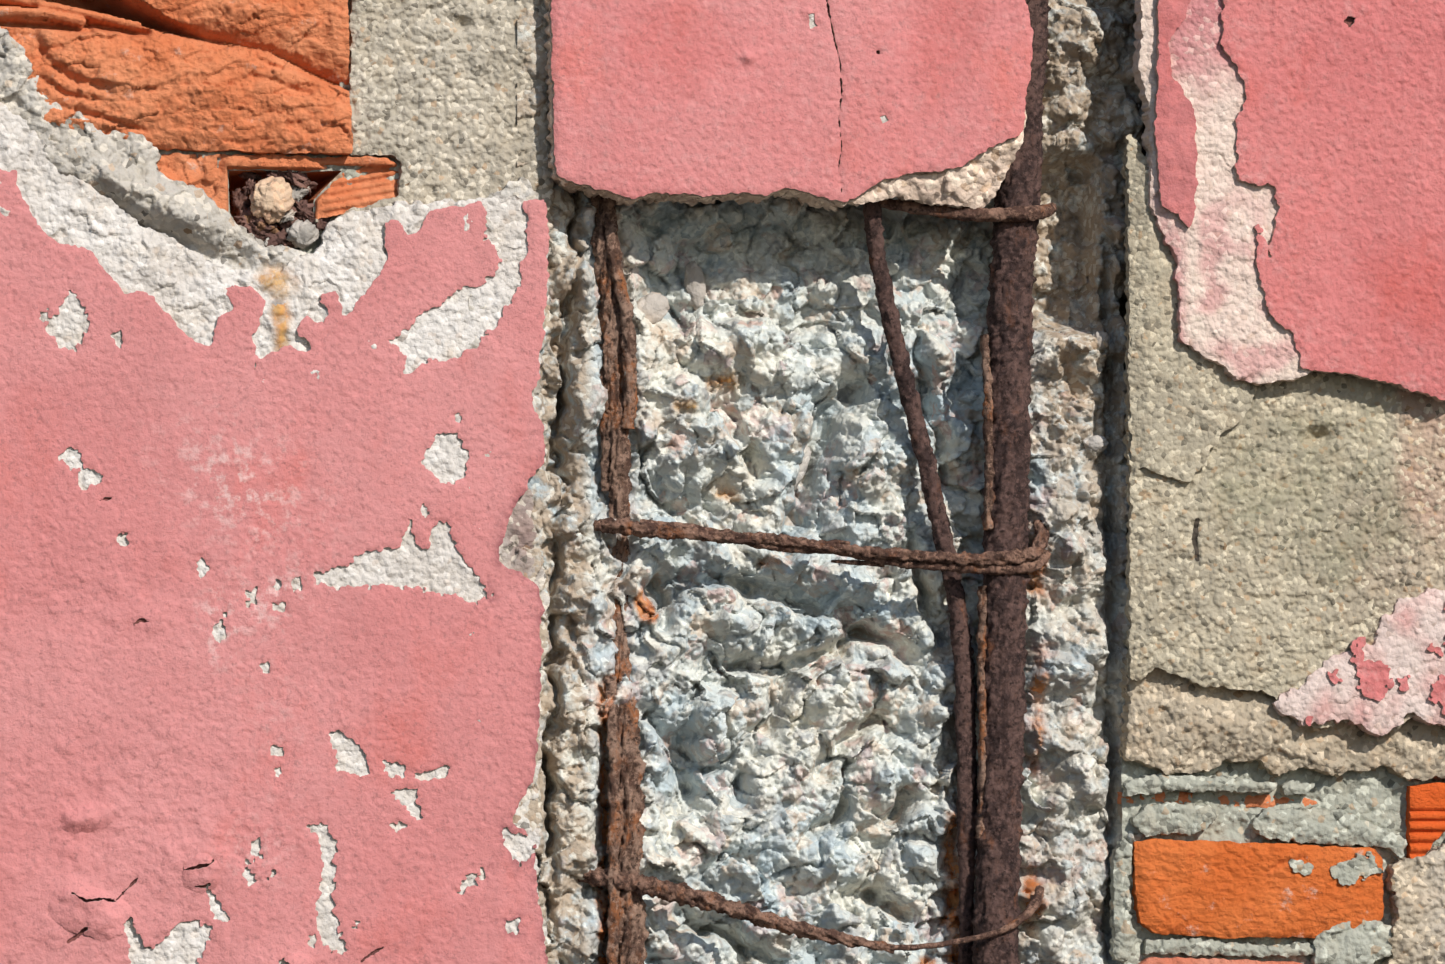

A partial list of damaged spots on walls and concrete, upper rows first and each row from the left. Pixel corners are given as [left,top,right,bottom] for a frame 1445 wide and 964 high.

peeling [0,27,529,382]
peeling [245,504,494,612]
corrosion [598,676,622,964]
corrosion [598,198,638,491]
corrosion [635,590,659,622]
spalling [613,111,1027,964]
crack [826,0,842,167]
corrosion [975,586,988,838]
corrosion [980,334,996,531]
spalling [1018,822,1030,964]
peeling [1122,0,1312,483]
peeling [1271,588,1445,738]